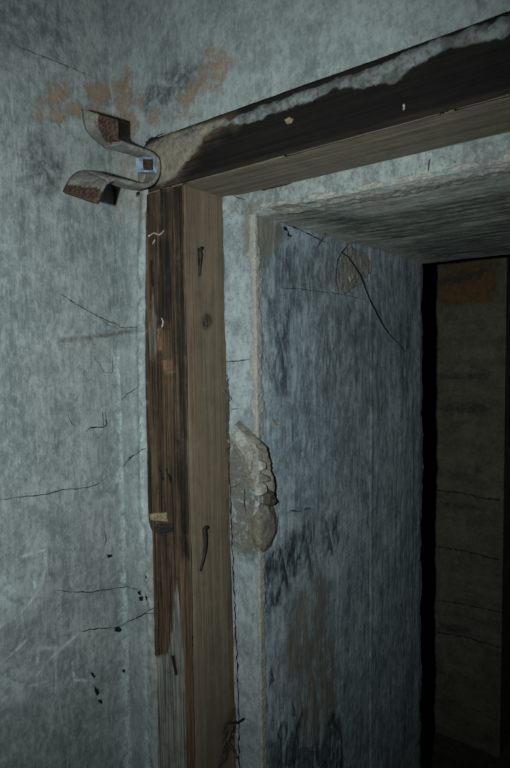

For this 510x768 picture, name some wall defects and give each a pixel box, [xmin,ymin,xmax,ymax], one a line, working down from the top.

rust [37,71,140,138]
crack [283,224,330,245]
spalling [336,244,372,294]
crack [61,294,135,328]
spalling [227,421,277,514]
crack [0,481,102,500]
crack [60,585,137,593]
crack [82,607,157,632]